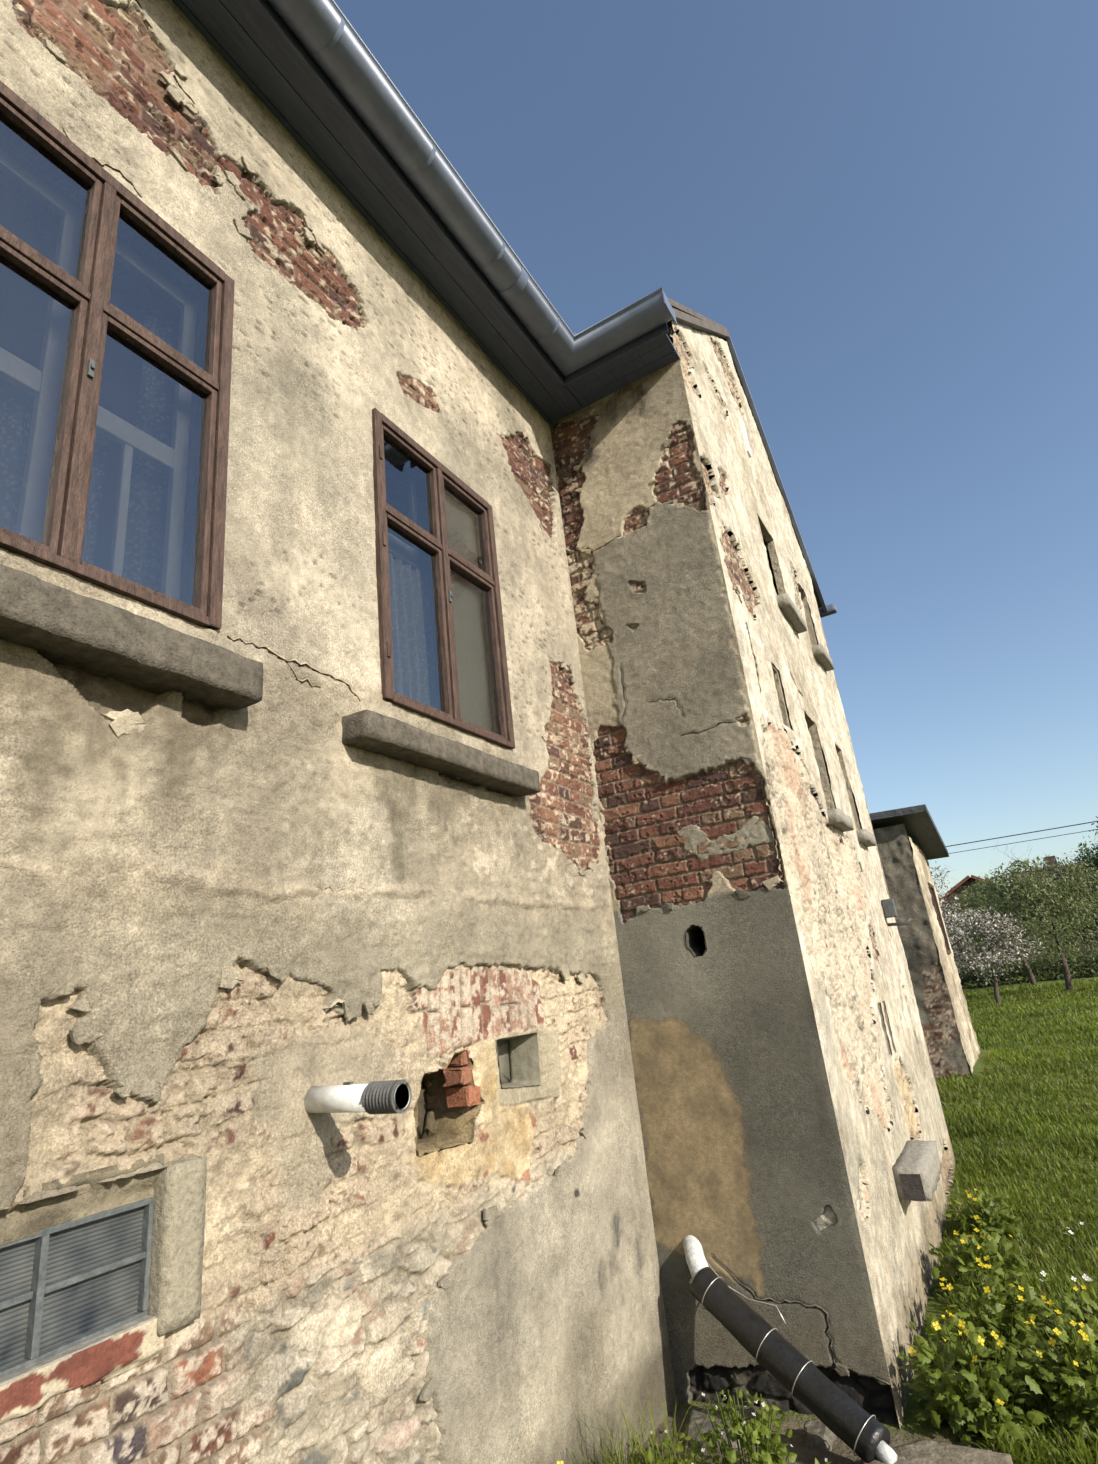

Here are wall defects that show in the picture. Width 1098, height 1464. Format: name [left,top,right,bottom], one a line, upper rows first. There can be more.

spalling [12,0,365,330]
crack [228,636,360,701]
spalling [396,373,440,413]
spalling [499,408,638,651]
spalling [630,582,646,594]
spalling [623,422,727,536]
spalling [720,526,758,620]
flaking render [529,658,920,1140]
flaking render [0,963,608,1464]
damp [629,1018,763,1298]